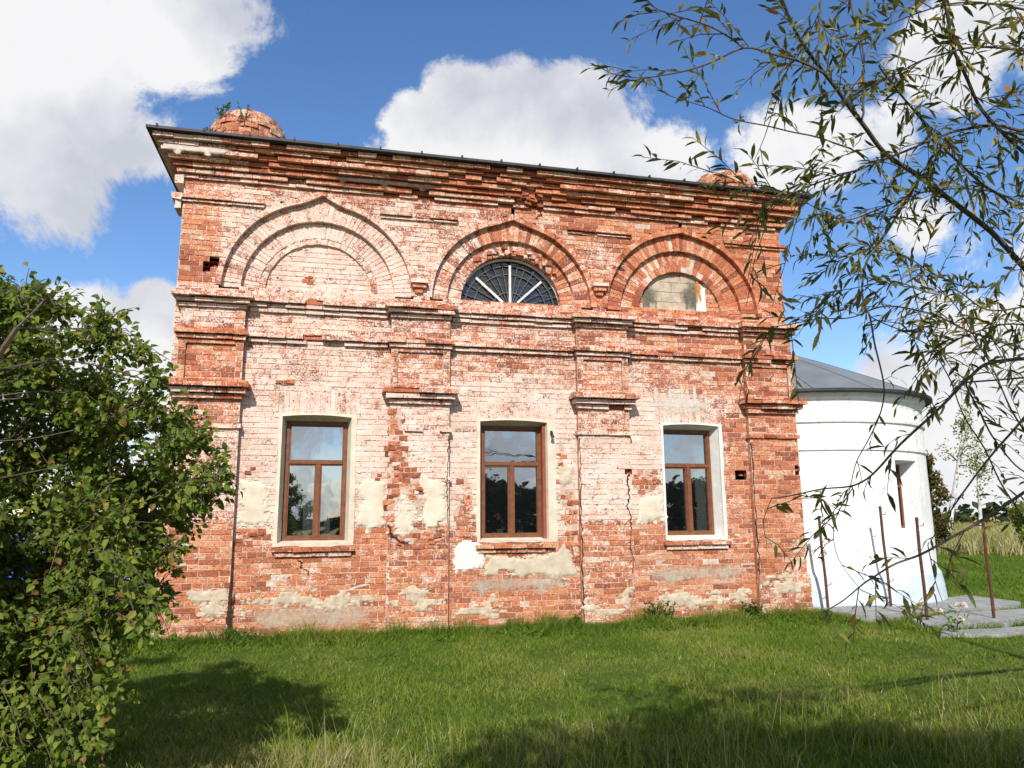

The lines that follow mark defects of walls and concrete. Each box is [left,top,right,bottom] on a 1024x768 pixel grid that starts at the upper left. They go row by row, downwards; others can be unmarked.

peeling [235,464,275,546]
crack [387,524,408,544]
spalling [356,407,580,624]
crack [624,474,635,573]
peeling [625,469,668,525]
peeling [187,585,375,622]